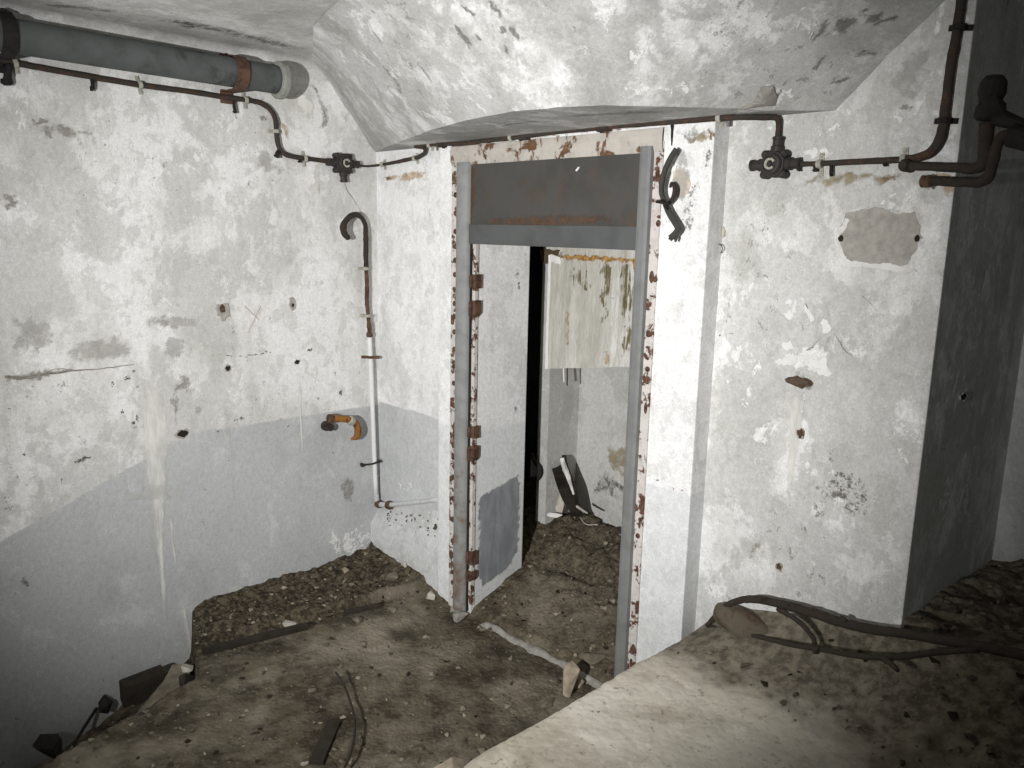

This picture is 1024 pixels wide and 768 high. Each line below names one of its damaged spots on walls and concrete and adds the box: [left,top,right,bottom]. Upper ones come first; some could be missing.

peeling [838,191,937,272]
peeling [783,297,832,335]
crack [5,364,134,380]
peeling [770,341,832,389]
water stain [111,370,176,616]
water stain [815,472,866,517]
water stain [182,608,191,653]